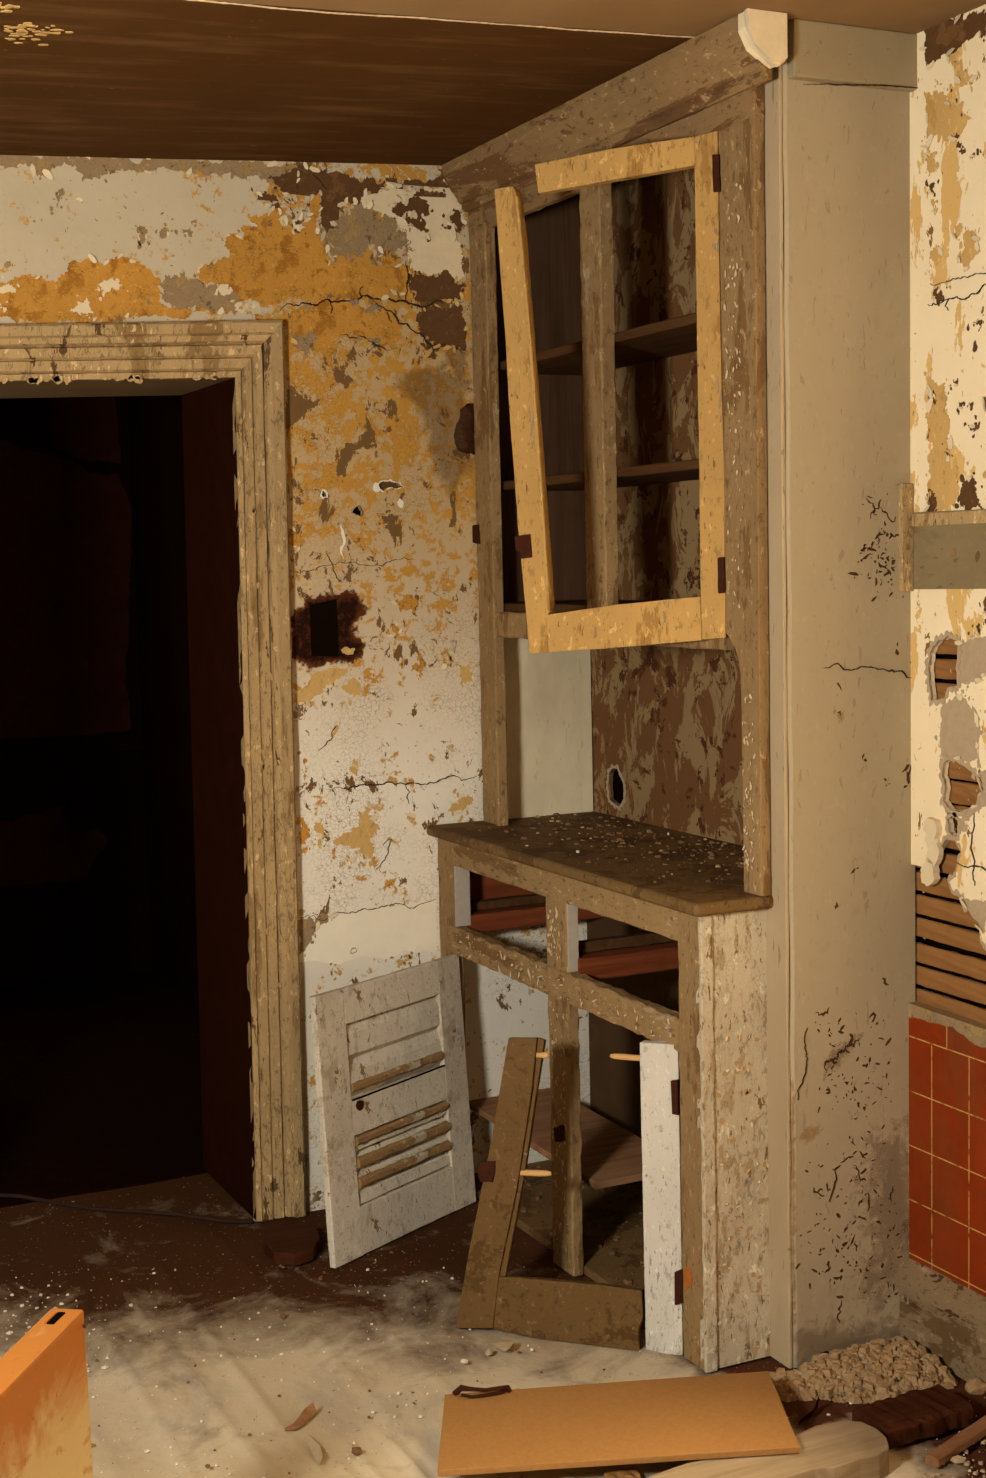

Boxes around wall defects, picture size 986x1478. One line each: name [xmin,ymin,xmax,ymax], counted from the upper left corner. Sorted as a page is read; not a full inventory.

peeling [192,373,221,381]
peeling [0,155,472,377]